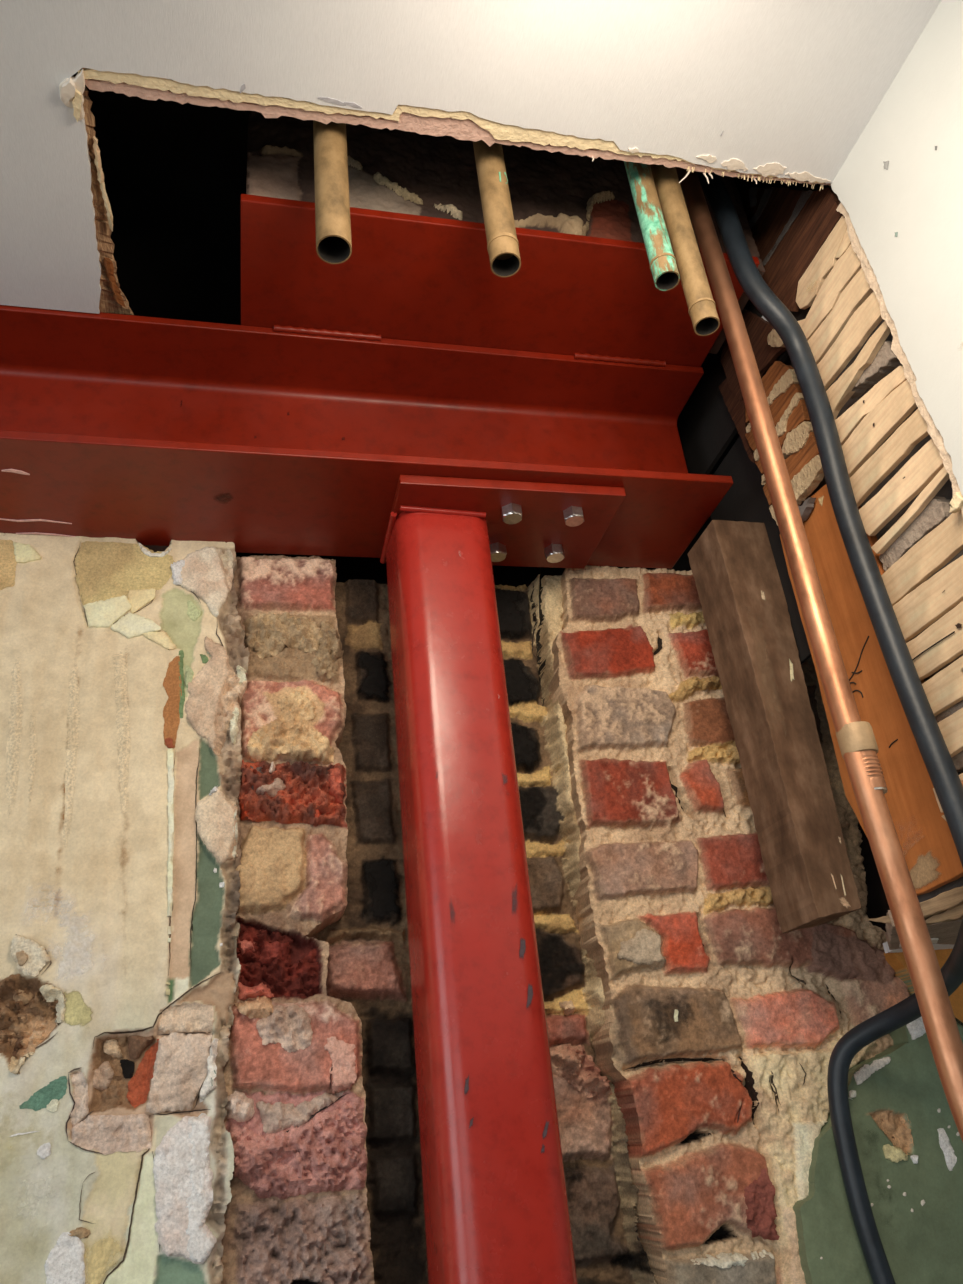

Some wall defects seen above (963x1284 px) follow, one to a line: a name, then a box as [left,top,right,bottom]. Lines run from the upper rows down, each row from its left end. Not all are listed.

spalling [836,202,963,517]
peeling [13,542,42,563]
crack [653,634,662,655]
spalling [83,543,346,888]
crack [670,781,684,811]
crack [789,961,841,1014]
crack [623,1057,806,1124]
spalling [19,1002,367,1264]